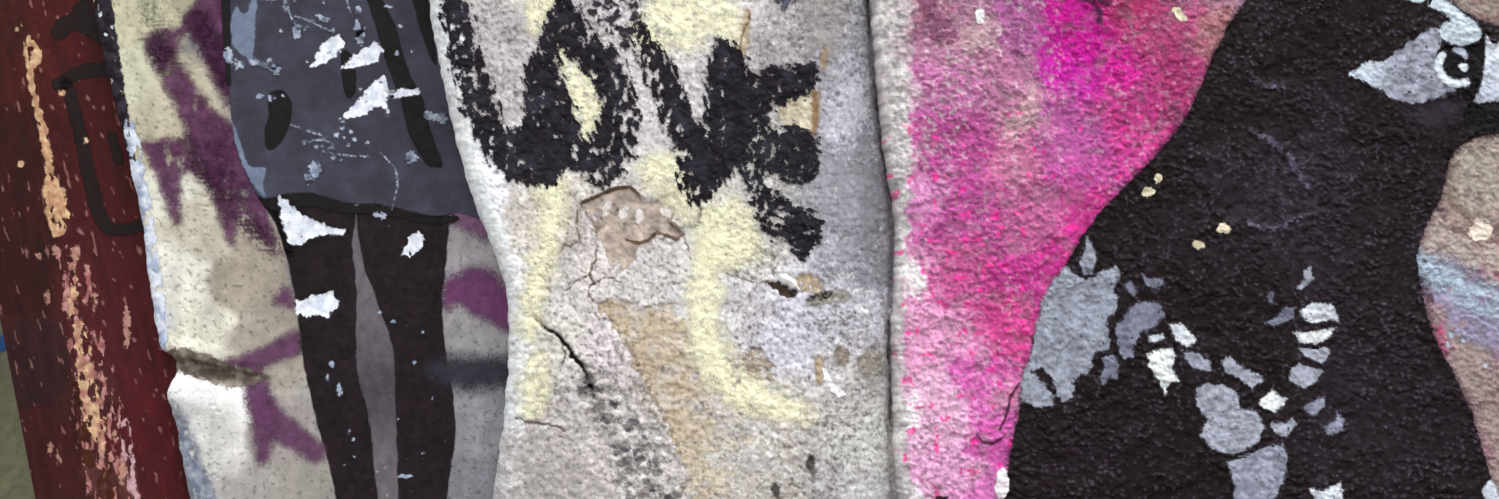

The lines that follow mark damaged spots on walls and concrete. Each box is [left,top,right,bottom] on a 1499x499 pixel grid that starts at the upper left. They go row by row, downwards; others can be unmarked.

crack [558,206,622,300]
spalling [580,185,687,271]
crack [535,318,596,399]